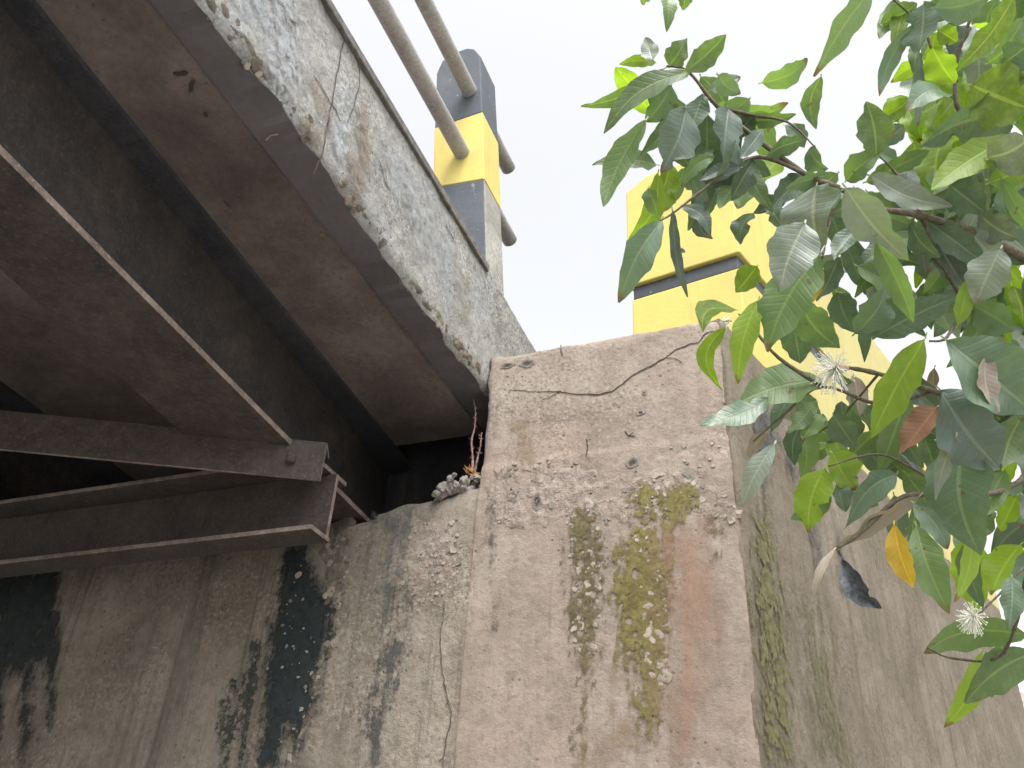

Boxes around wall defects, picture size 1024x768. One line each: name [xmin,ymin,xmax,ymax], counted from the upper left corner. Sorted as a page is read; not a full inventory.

crack [313,40,360,175]
crack [488,331,713,399]
damp [0,571,61,763]
damp [215,545,337,768]
crack [439,602,452,766]
damp [559,476,724,760]
damp [744,409,860,768]